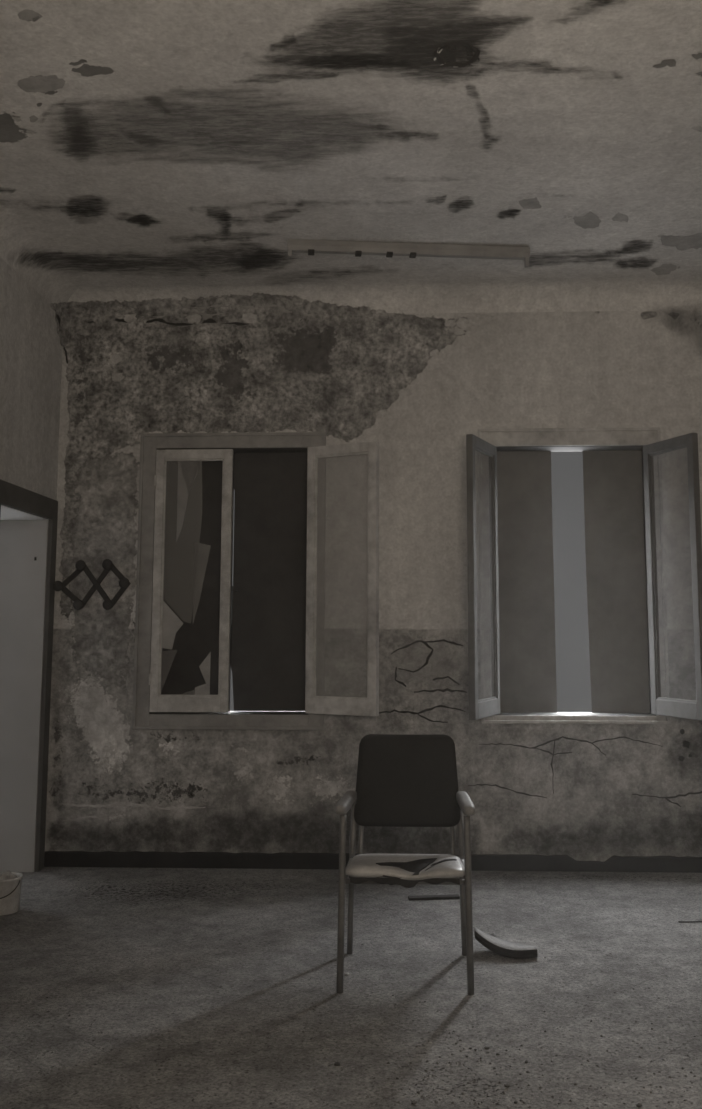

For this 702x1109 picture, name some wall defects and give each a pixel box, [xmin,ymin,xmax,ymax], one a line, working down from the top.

water stain [248,23,498,83]
peeling [653,59,676,68]
peeling [0,59,114,143]
water stain [52,91,435,164]
water stain [39,196,105,221]
water stain [20,202,315,276]
peeling [660,233,702,250]
peeling [49,293,494,807]
crack [379,705,466,723]
crack [468,736,663,798]
crack [632,791,702,807]